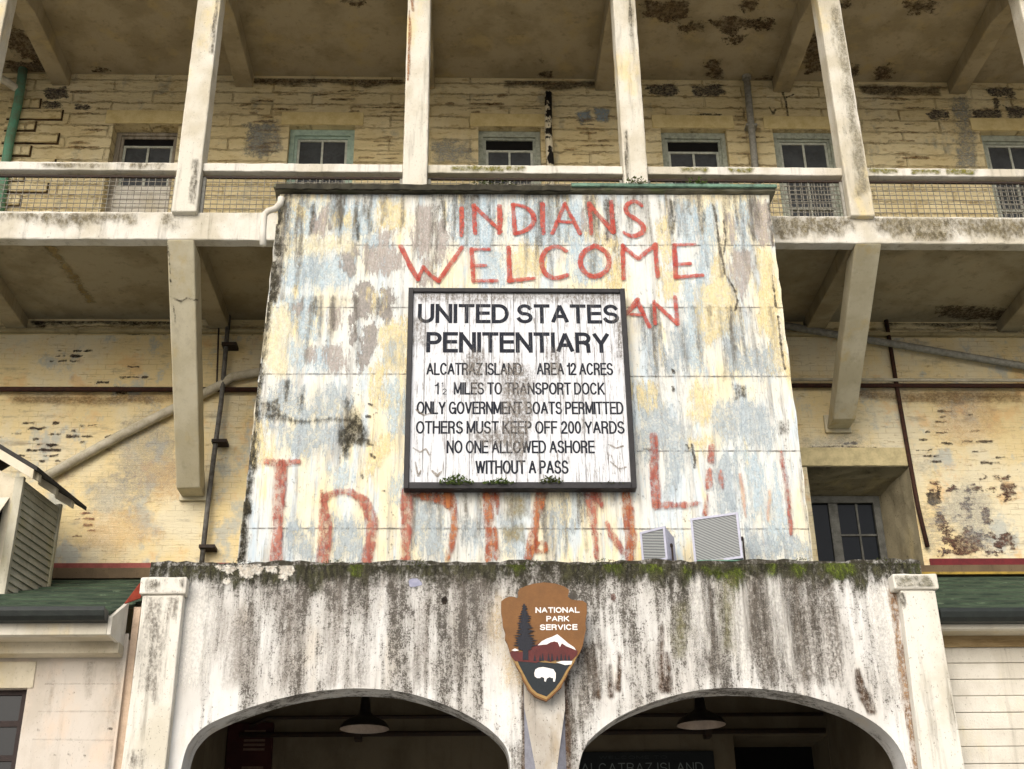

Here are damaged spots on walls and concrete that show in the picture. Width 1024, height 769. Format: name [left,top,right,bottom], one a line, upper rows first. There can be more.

damp [3,213,134,225]
damp [418,293,619,303]
crack [712,204,739,311]
damp [875,217,1024,241]
peeling [15,421,96,463]
damp [146,194,525,593]
damp [476,359,535,463]
spalling [916,410,1017,557]
damp [146,598,177,689]
damp [560,524,932,682]
damp [509,685,525,769]
damp [564,646,602,769]